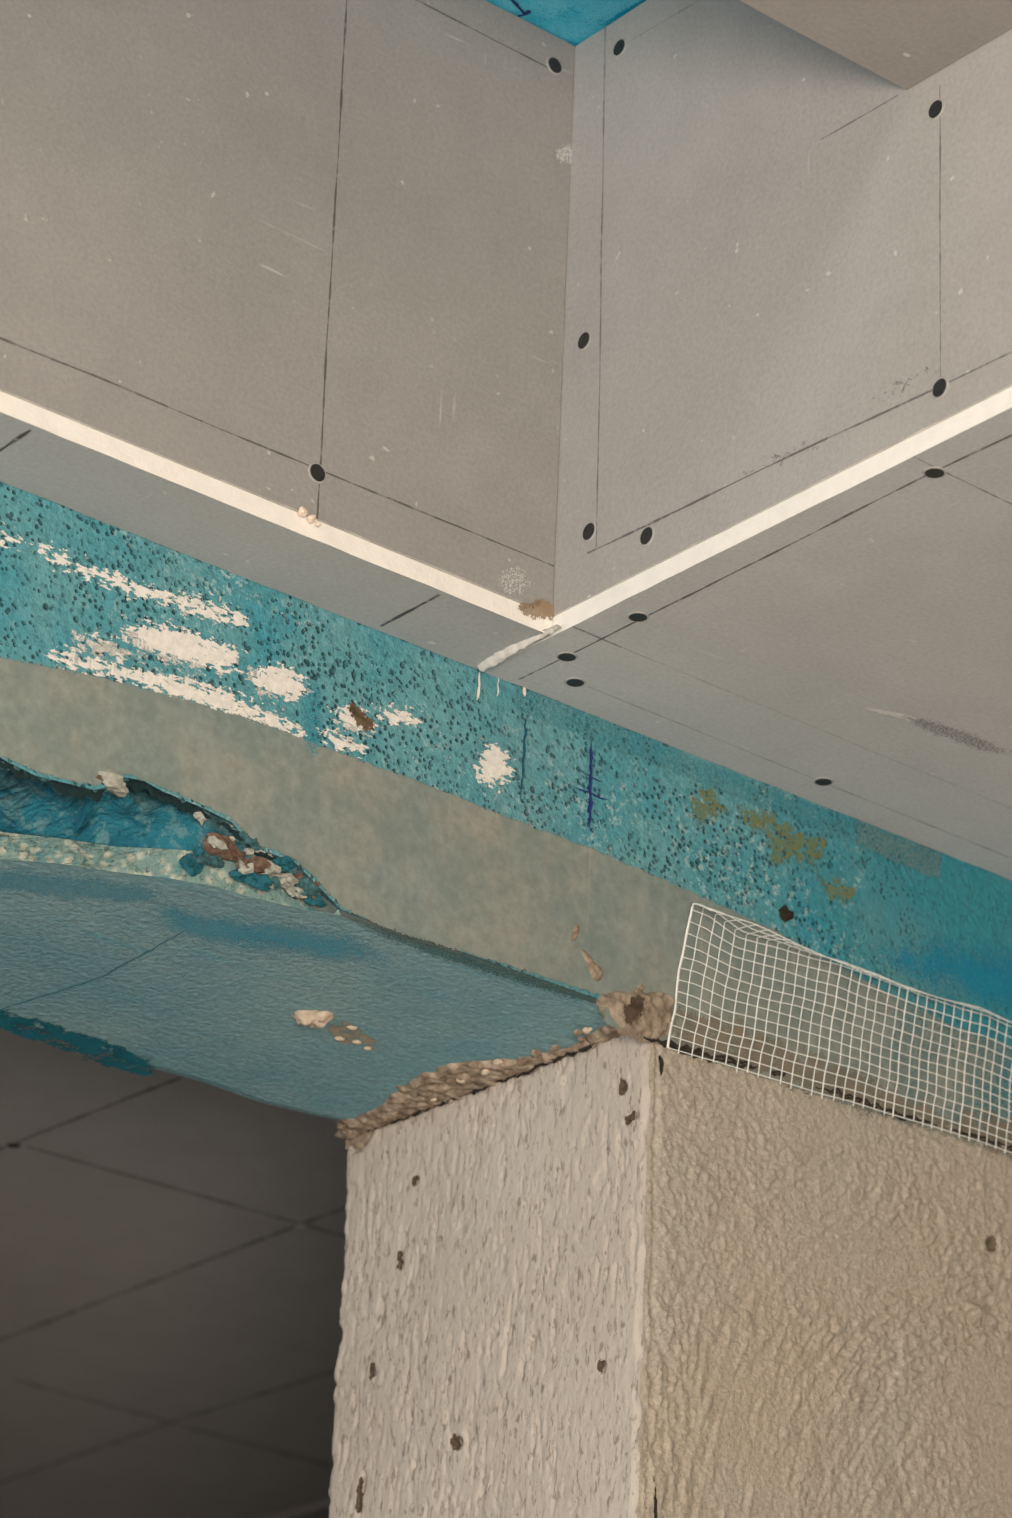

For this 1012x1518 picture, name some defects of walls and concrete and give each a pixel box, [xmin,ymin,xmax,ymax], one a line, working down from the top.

spalling [0,758,340,915]
peeling [292,1010,372,1050]
spalling [334,925,675,1154]